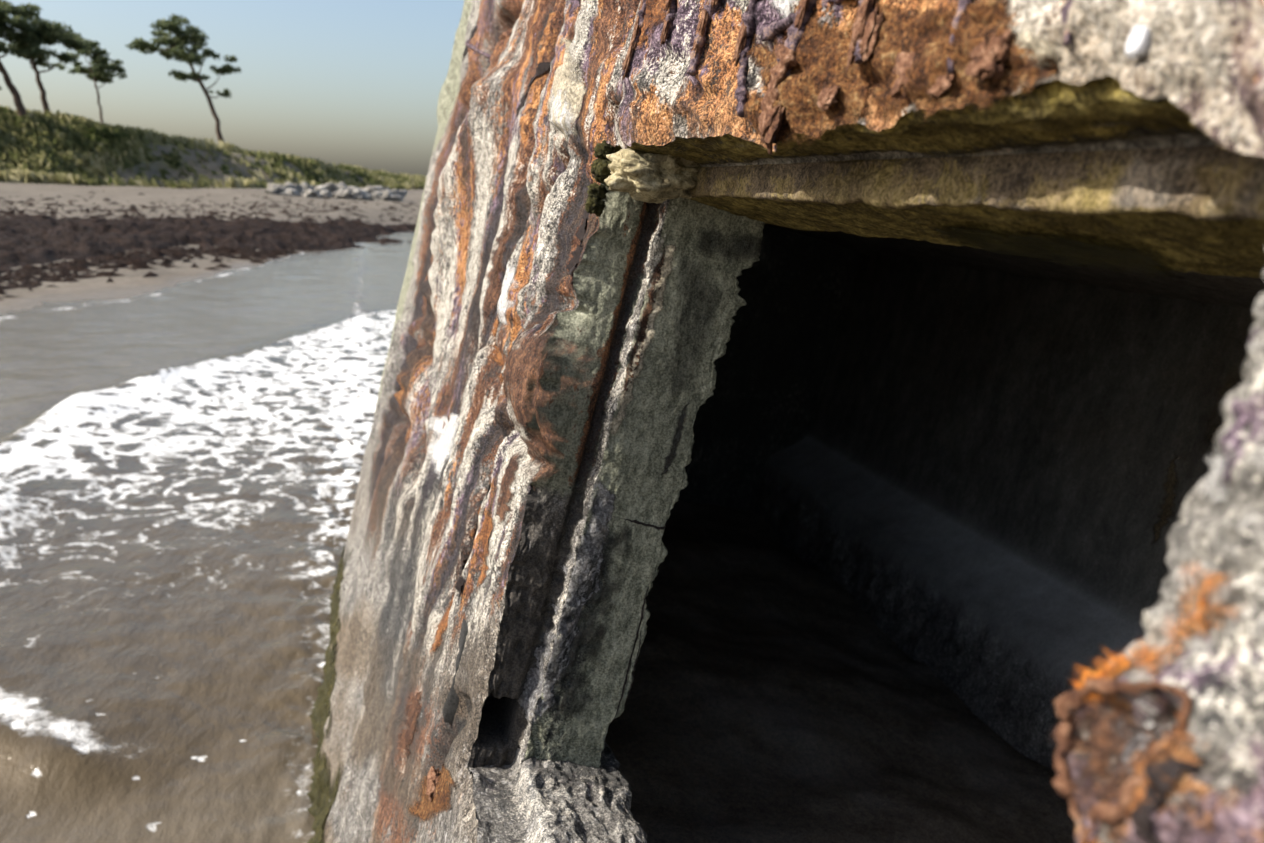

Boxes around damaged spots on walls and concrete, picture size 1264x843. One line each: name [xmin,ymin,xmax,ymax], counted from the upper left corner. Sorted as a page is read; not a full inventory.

corrosion [637,0,670,47]
corrosion [761,44,797,115]
corrosion [482,227,506,383]
corrosion [470,453,521,587]
corrosion [430,593,455,653]
corrosion [1072,645,1168,705]
corrosion [1127,710,1195,818]